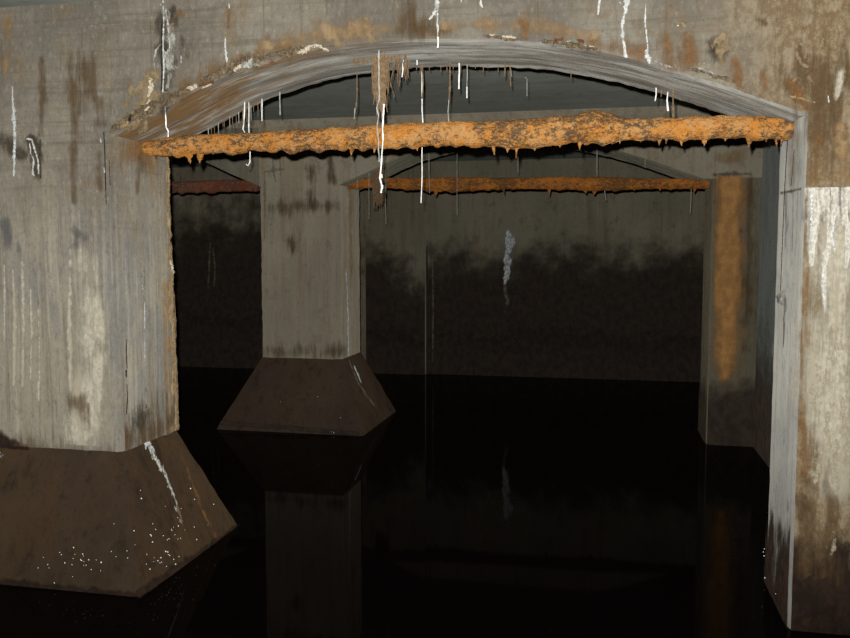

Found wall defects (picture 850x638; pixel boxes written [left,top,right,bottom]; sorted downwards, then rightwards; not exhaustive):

leakage [0,86,42,178]
leakage [797,48,848,160]
leakage [366,228,773,468]
rust [714,172,752,382]
leakage [780,174,850,507]
leakage [125,407,184,529]
leakage [764,504,850,636]